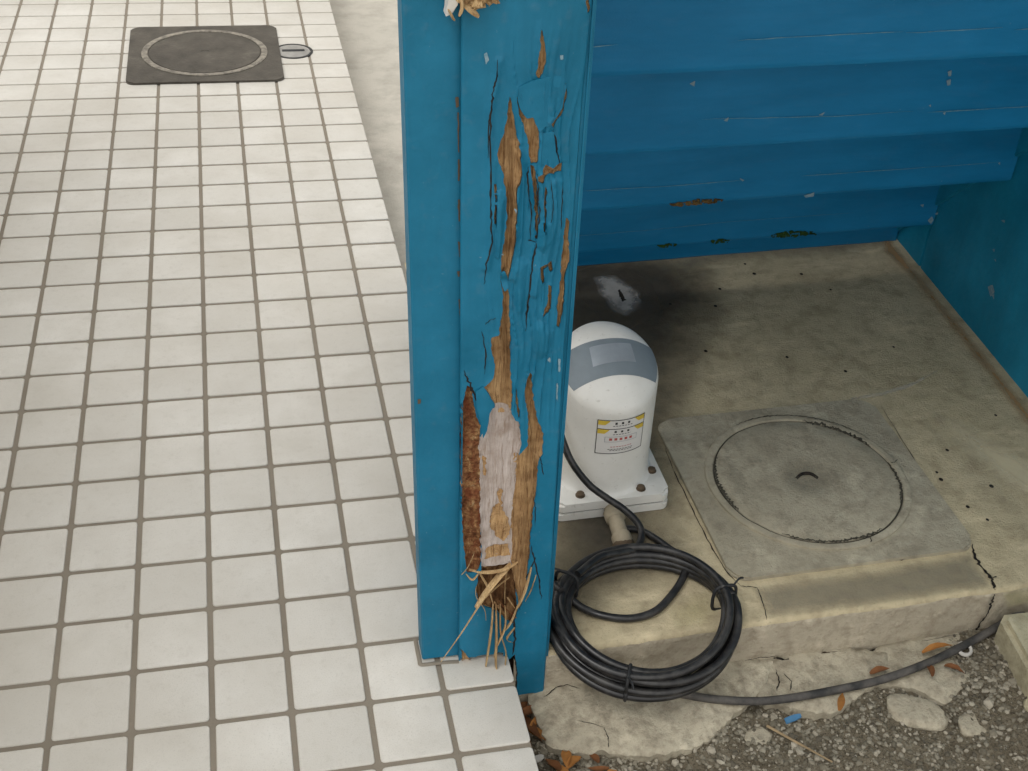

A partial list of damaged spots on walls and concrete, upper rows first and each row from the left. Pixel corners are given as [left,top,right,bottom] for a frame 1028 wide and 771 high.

peeling [517,30,567,238]
peeling [540,218,569,326]
peeling [476,387,495,438]
spalling [441,552,536,670]
crack [926,544,997,641]